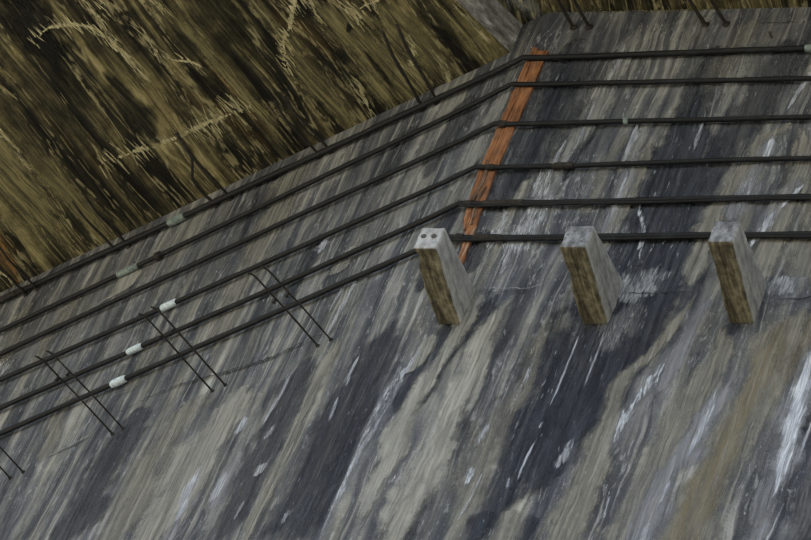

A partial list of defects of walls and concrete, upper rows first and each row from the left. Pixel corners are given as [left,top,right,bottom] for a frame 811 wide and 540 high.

leakage [278,29,353,127]
leakage [317,0,491,116]
leakage [423,96,474,178]
leakage [434,87,512,234]
leakage [0,302,33,376]
leakage [34,290,81,362]
leakage [101,270,142,302]
leakage [209,162,308,354]
leakage [282,234,327,306]
leakage [455,29,811,540]
leakage [50,295,512,540]